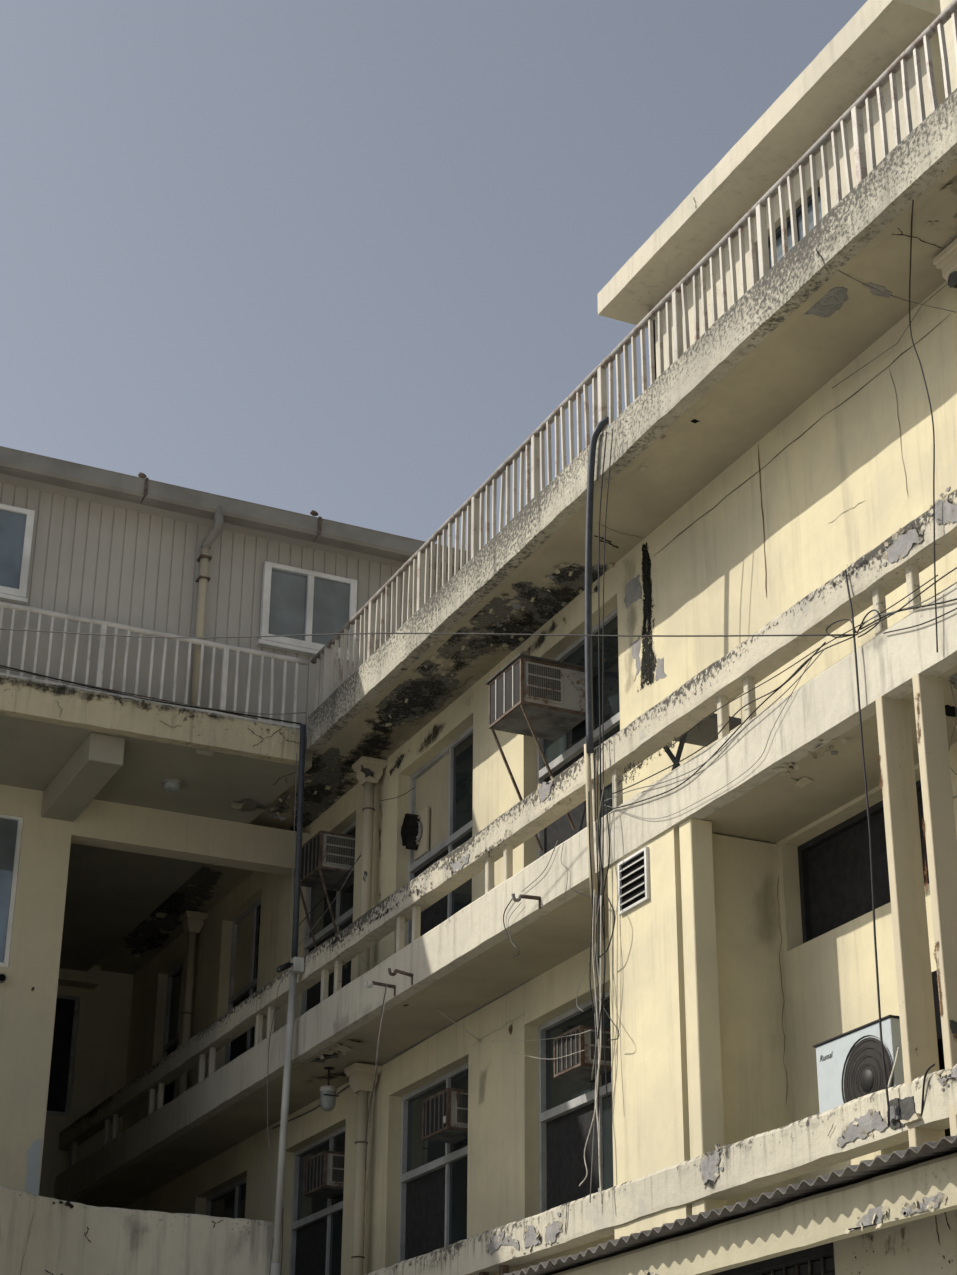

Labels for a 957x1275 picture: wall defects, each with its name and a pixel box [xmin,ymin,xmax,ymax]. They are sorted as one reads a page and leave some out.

peeling [929,487,957,525]
peeling [882,526,924,567]
leakage [624,542,667,691]
leakage [0,677,188,712]
leakage [323,576,598,804]
spalling [945,705,957,717]
leakage [357,868,458,936]
peeling [837,1096,922,1147]
peeling [696,1143,724,1189]
peeling [487,1213,563,1257]
peeling [844,1192,947,1234]